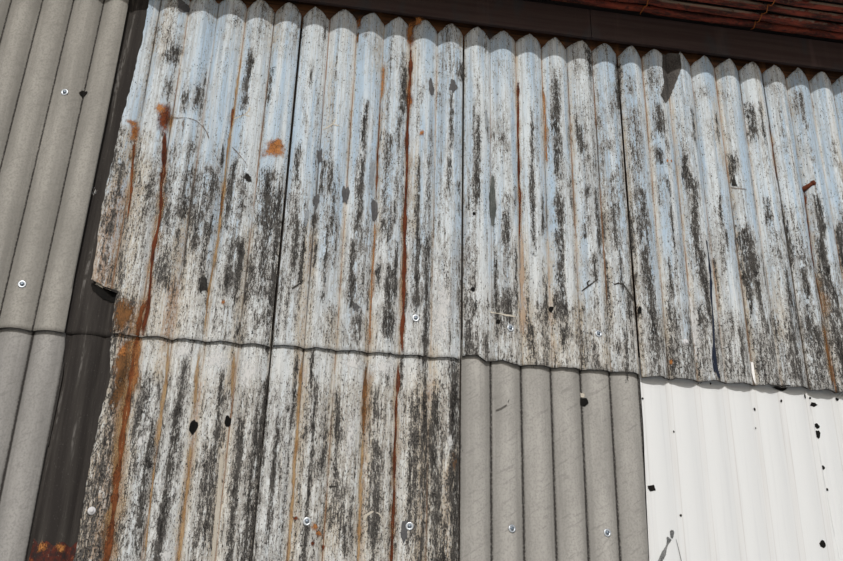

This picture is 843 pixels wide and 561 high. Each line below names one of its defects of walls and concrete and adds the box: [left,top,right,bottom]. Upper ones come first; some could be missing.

spalling [91,282,118,302]
corrosion [103,103,173,561]
corrosion [262,139,284,156]
leakage [348,100,369,308]
corrosion [400,17,421,351]
leakage [530,106,568,351]
leakage [616,184,659,383]
leakage [681,155,712,384]
crack [706,240,720,378]
leakage [154,391,184,561]
leakage [226,369,270,561]
corrosion [390,366,400,561]